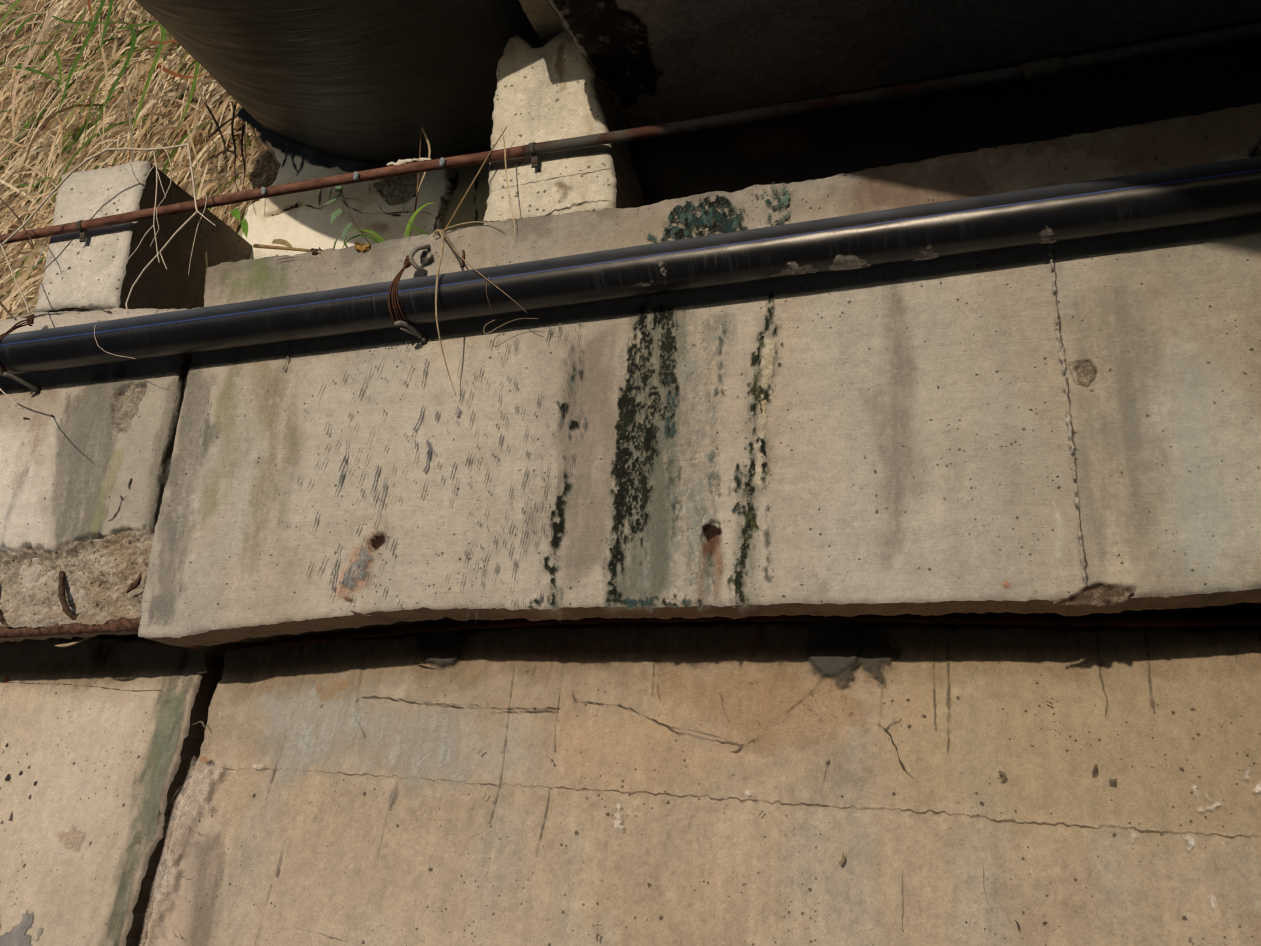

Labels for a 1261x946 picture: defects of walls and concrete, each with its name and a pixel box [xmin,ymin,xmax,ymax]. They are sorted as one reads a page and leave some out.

spalling [0,478,154,638]
water stain [527,305,702,610]
water stain [727,292,783,604]
crack [1052,250,1088,587]
crack [356,684,805,752]
crack [878,720,906,772]